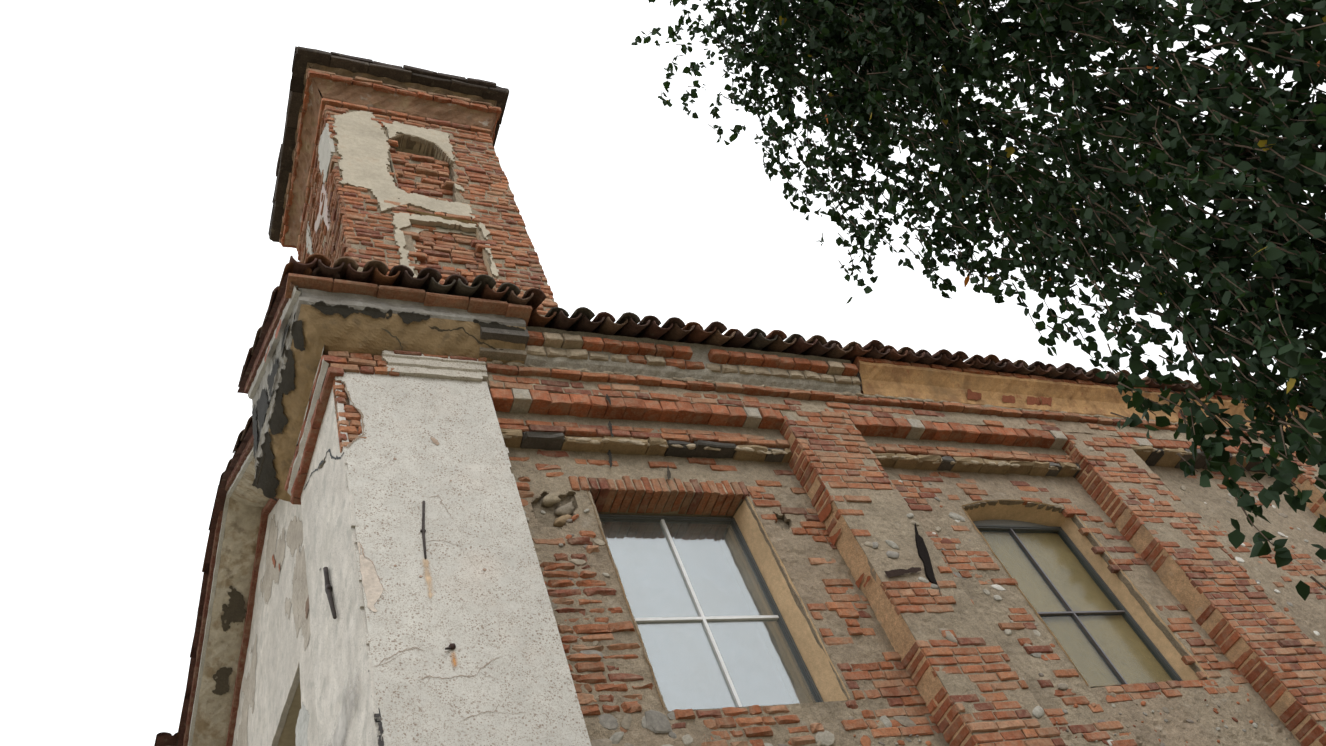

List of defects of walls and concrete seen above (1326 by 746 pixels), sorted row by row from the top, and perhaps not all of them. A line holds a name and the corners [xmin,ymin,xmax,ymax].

spalling [332,379,367,453]
crack [304,449,344,489]
peeling [260,515,321,650]
crack [373,647,526,721]